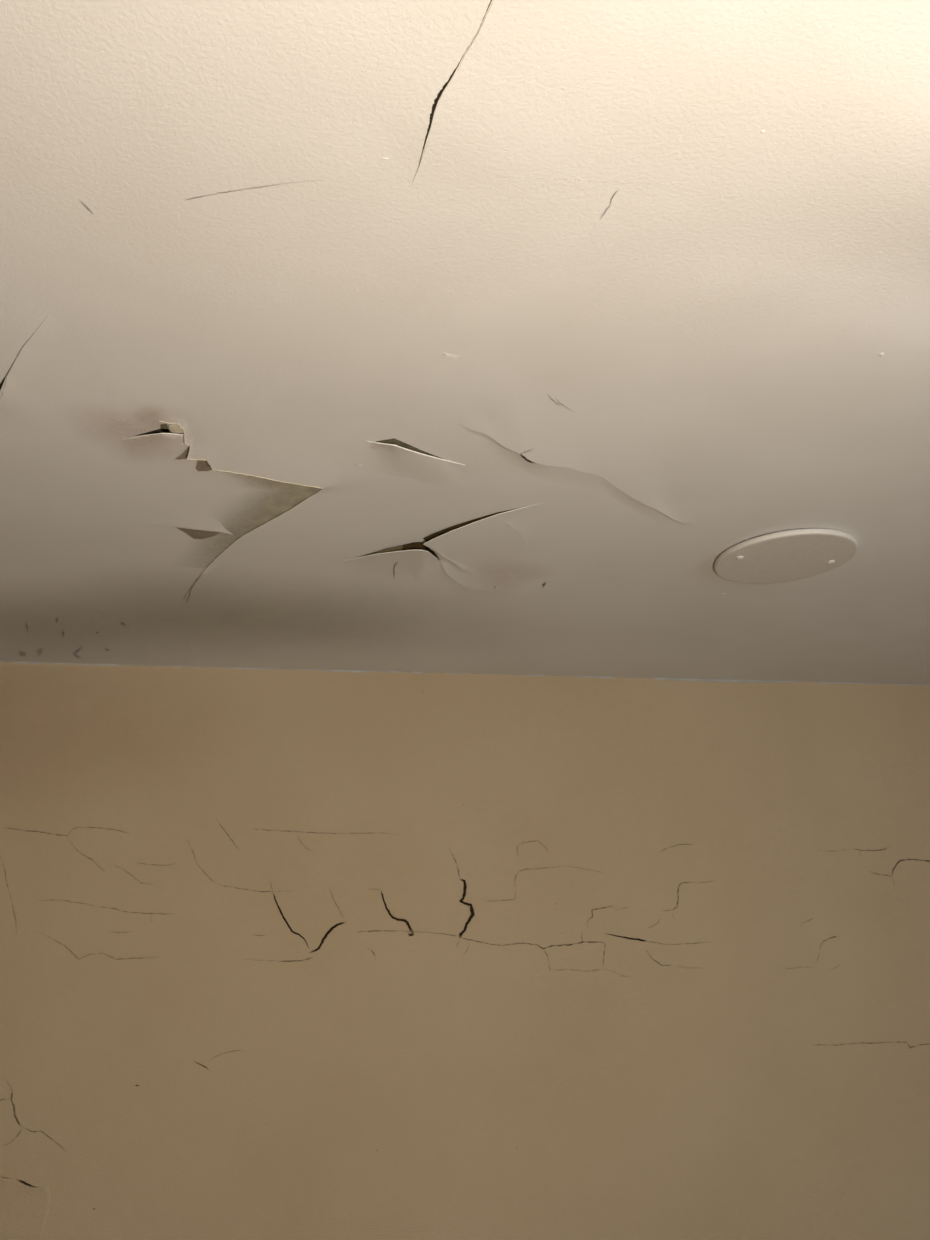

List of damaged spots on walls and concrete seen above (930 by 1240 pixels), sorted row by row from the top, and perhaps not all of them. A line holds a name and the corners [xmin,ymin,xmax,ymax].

peeling [456,352,697,530]